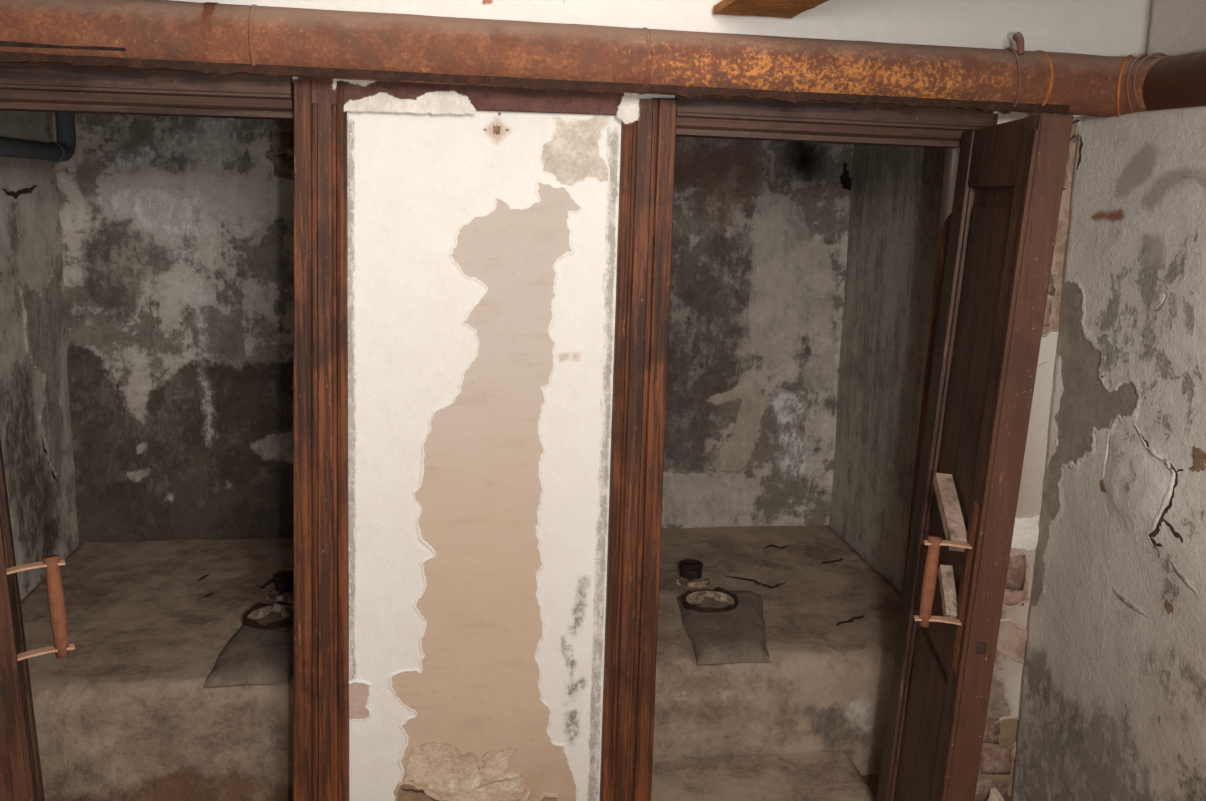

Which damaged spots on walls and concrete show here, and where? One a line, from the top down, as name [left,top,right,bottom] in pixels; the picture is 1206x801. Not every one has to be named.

corrosion [202,2,217,40]
water stain [110,118,240,171]
water stain [67,184,293,545]
peeling [388,114,611,801]
water stain [664,233,753,466]
peeling [996,115,1144,664]
crack [1102,420,1200,599]
spalling [1188,445,1206,472]
peeling [349,679,372,721]
water stain [1017,653,1152,801]